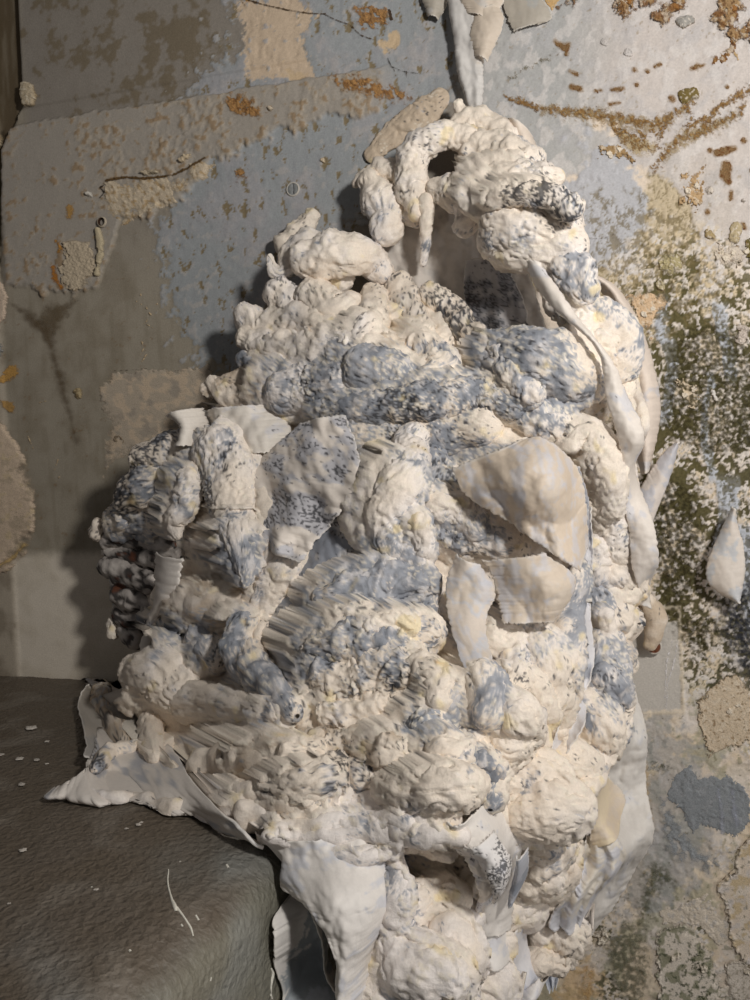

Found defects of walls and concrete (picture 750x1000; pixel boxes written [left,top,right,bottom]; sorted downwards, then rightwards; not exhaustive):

crack [241,0,371,39]
peeling [422,0,559,107]
peeling [597,144,636,163]
flaking render [0,282,8,322]
flaking render [51,240,96,291]
leakage [664,325,750,454]
flaking render [0,422,36,574]
leakage [654,480,750,677]
peeling [655,765,750,1000]